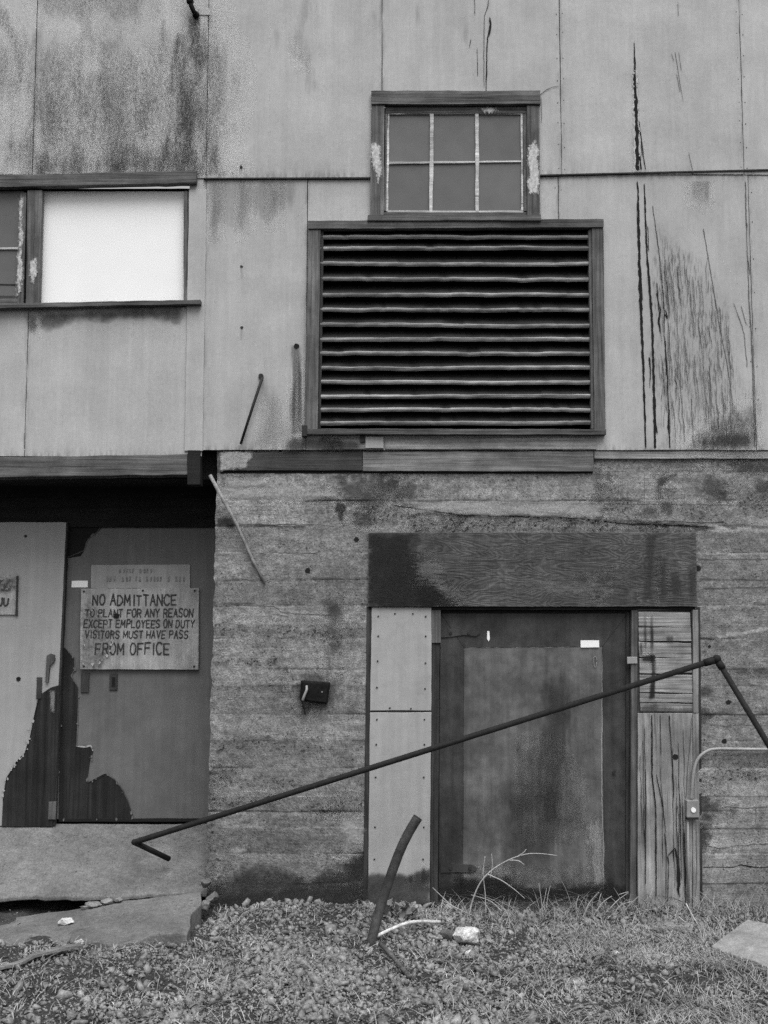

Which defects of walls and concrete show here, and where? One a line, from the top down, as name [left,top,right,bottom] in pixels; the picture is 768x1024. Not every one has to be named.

leakage [112,73,201,172]
peeling [371,143,382,183]
peeling [527,141,540,194]
peeling [17,198,38,296]
leakage [226,473,448,606]
peeling [1,640,134,826]
crack [640,715,768,901]